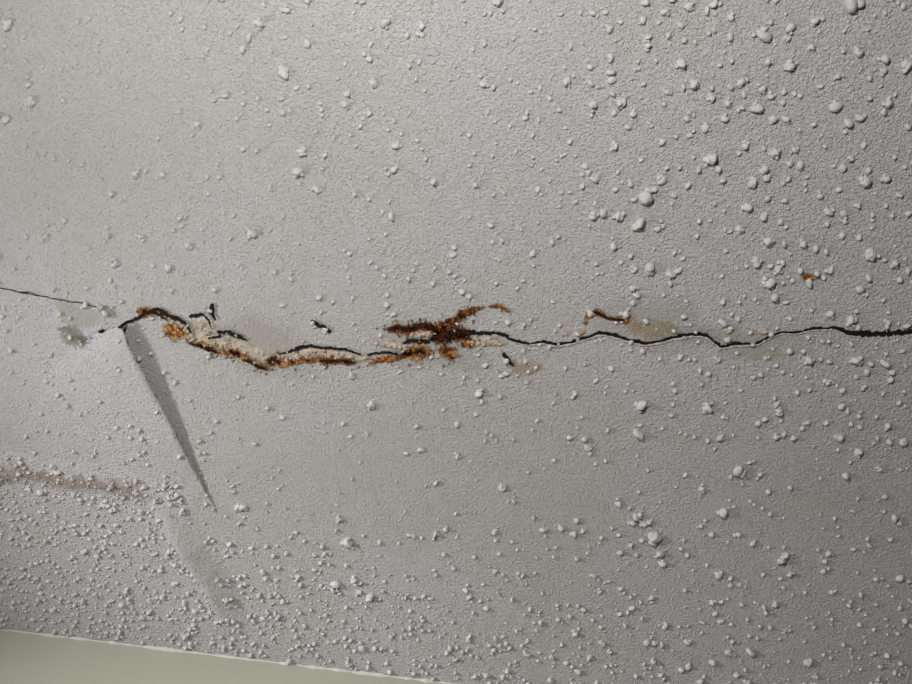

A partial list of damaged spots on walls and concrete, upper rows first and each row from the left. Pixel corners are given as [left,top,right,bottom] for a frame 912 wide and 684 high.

crack [0,288,97,308]
crack [118,303,248,341]
corrosion [136,299,510,377]
crack [279,319,433,355]
crack [466,311,912,367]